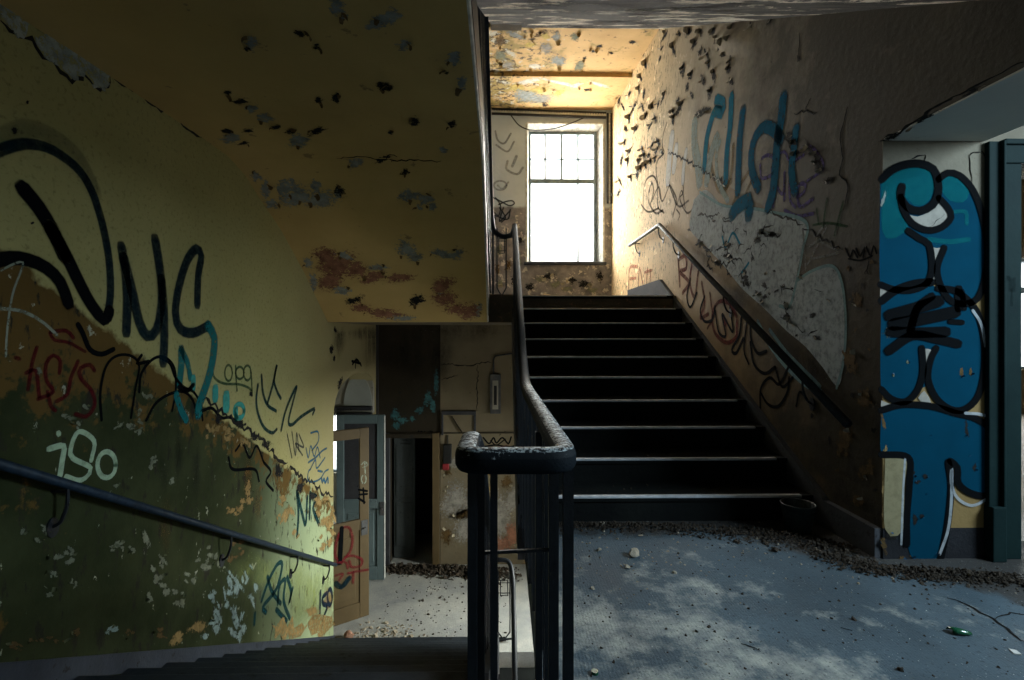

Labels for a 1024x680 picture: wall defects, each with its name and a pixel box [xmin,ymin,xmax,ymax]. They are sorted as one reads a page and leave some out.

flaking render [0,4,133,92]
peeling [217,90,326,150]
peeling [494,1,772,198]
peeling [250,170,346,209]
crack [338,154,440,162]
peeling [302,234,483,322]
flaking render [440,457,467,547]
flaking render [488,475,517,550]
peeling [44,546,77,597]
peeling [109,529,261,647]
flaking render [272,589,335,640]